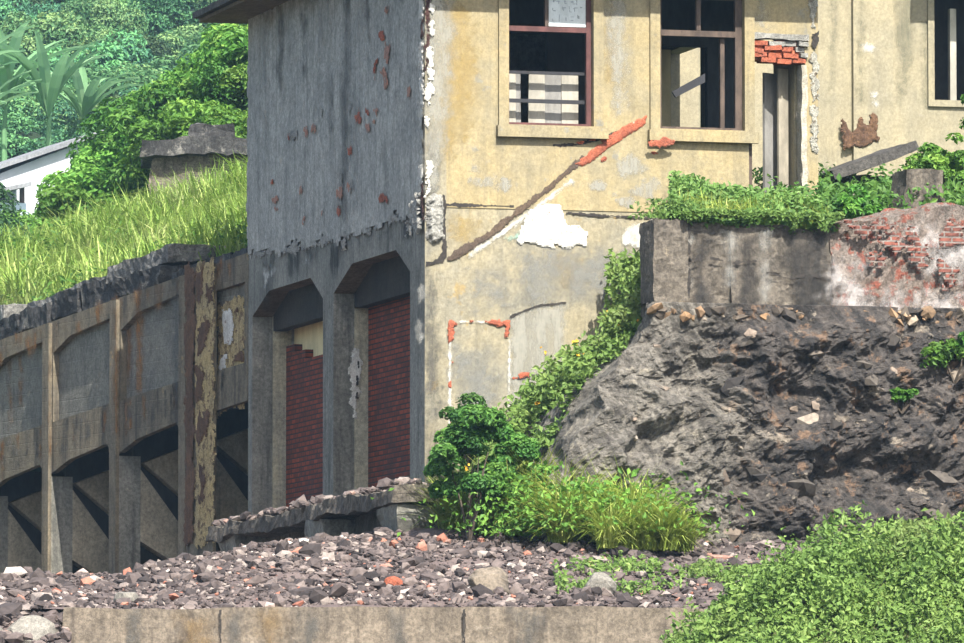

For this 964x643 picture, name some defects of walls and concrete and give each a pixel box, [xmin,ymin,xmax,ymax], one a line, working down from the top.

spalling [373,31,390,90]
spalling [407,0,435,127]
crack [553,131,616,147]
flaking render [575,116,647,166]
flaking render [648,137,675,155]
corrosion [841,112,880,151]
spalling [418,160,434,221]
flaking render [517,202,588,249]
crack [566,212,653,220]
flaking render [843,218,964,291]
peeling [469,307,563,401]
peeling [183,256,245,549]